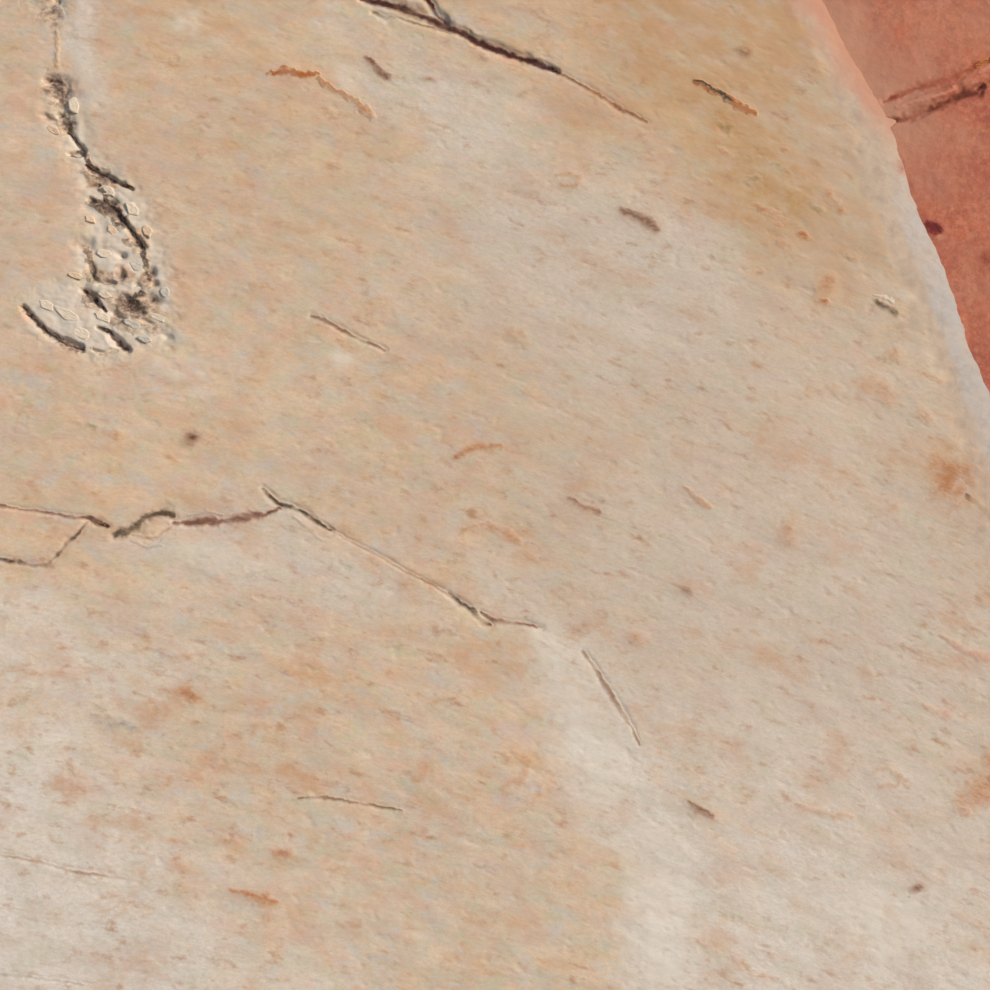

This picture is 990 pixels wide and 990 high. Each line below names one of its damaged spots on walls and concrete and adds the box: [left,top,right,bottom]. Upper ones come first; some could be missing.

crack [352,0,651,129]
flaking render [0,0,250,405]
crack [0,481,543,636]
crack [579,648,643,747]